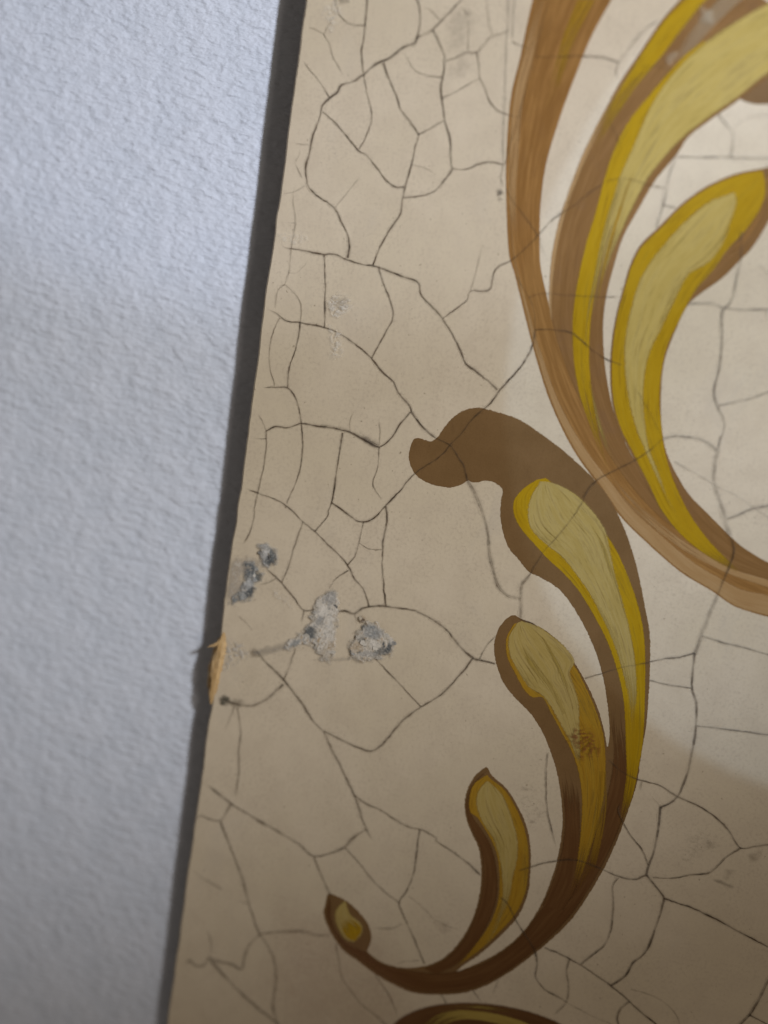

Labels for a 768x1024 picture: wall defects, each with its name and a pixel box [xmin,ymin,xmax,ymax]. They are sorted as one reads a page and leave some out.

crack [251,0,615,614]
spalling [229,544,277,603]
spalling [207,632,226,704]
crack [267,663,312,720]
spalling [349,621,397,662]
crack [329,629,495,752]
crack [650,640,768,745]
crack [545,755,553,833]
crack [342,770,479,964]
crack [503,775,768,1024]